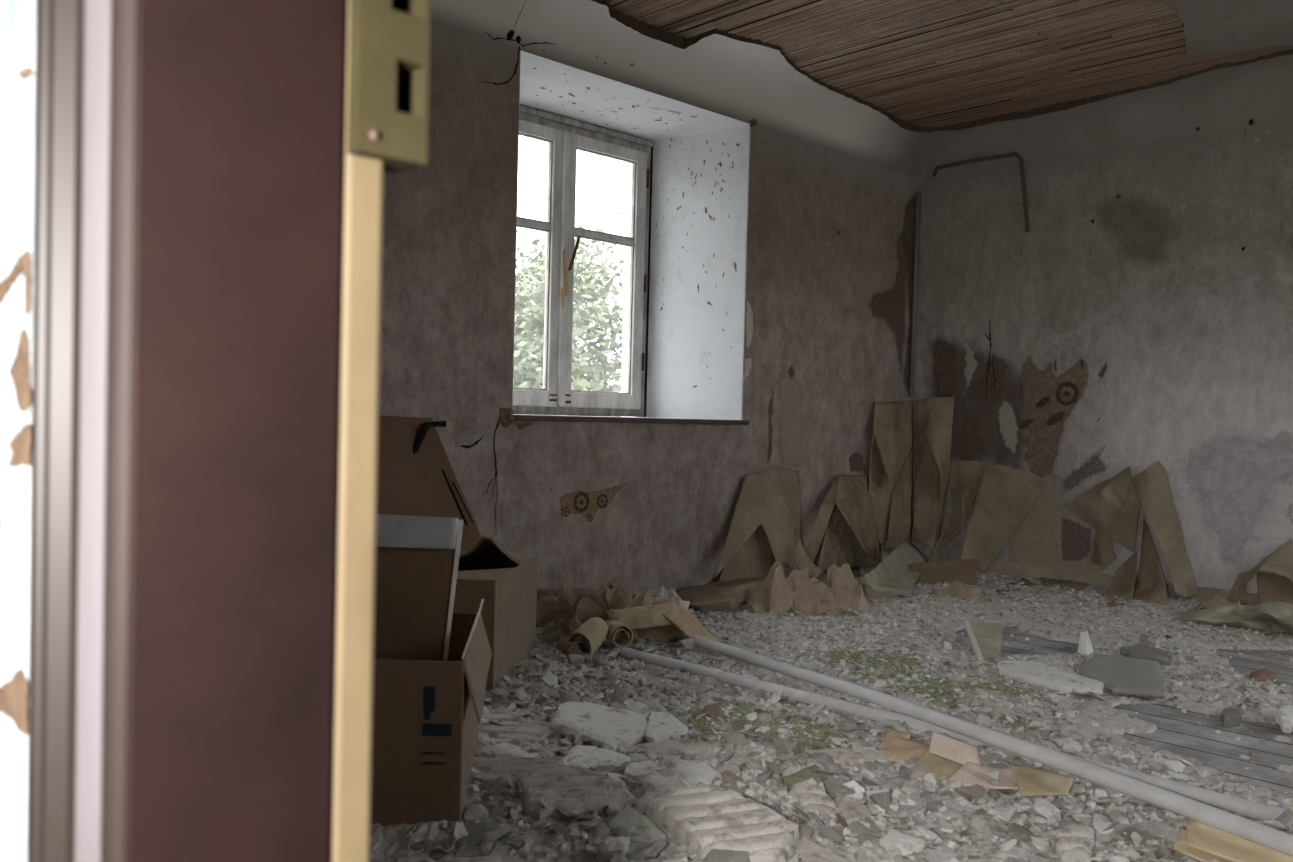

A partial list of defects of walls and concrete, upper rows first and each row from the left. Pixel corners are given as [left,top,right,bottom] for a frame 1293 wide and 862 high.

spalling [592,0,1293,132]
peeling [0,250,31,467]
peeling [871,235,907,365]
peeling [933,340,1107,477]
peeling [560,483,626,522]
peeling [0,669,28,736]